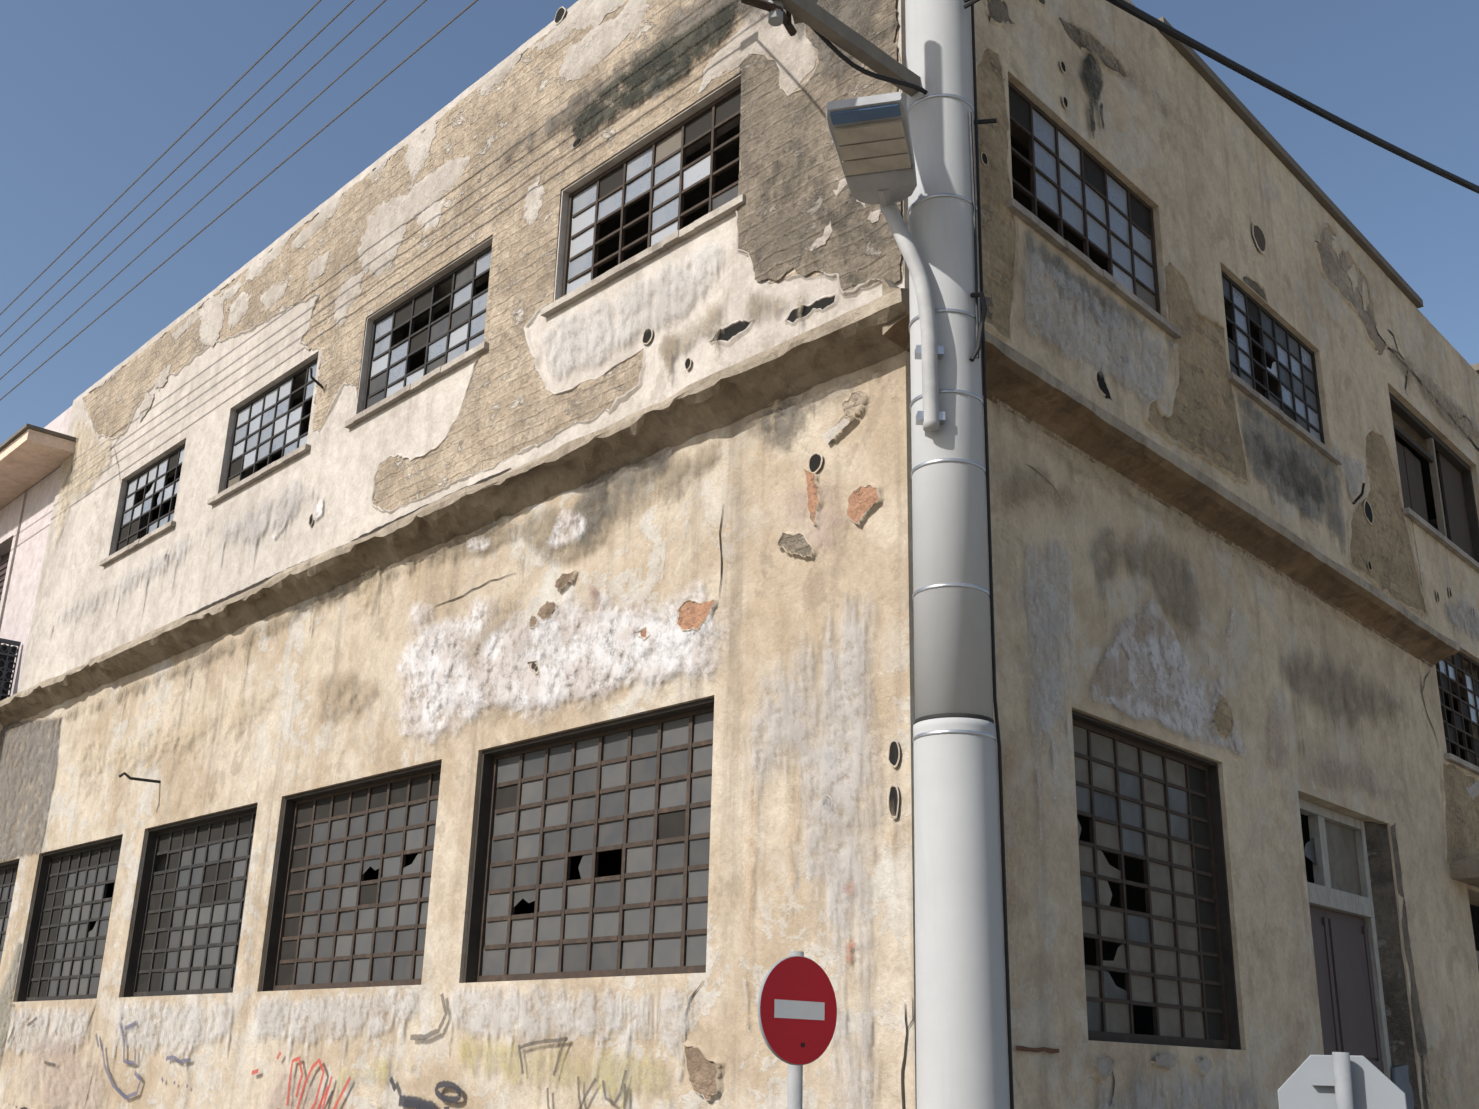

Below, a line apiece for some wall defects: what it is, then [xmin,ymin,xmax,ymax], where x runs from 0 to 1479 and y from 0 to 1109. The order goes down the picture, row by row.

spalling [82,0,818,514]
spalling [762,267,839,284]
peeling [810,222,833,251]
spalling [822,389,870,444]
damp [997,399,1313,599]
damp [1241,395,1365,552]
peeling [398,570,718,740]
peeling [1093,602,1243,754]
crack [901,1000,914,1109]